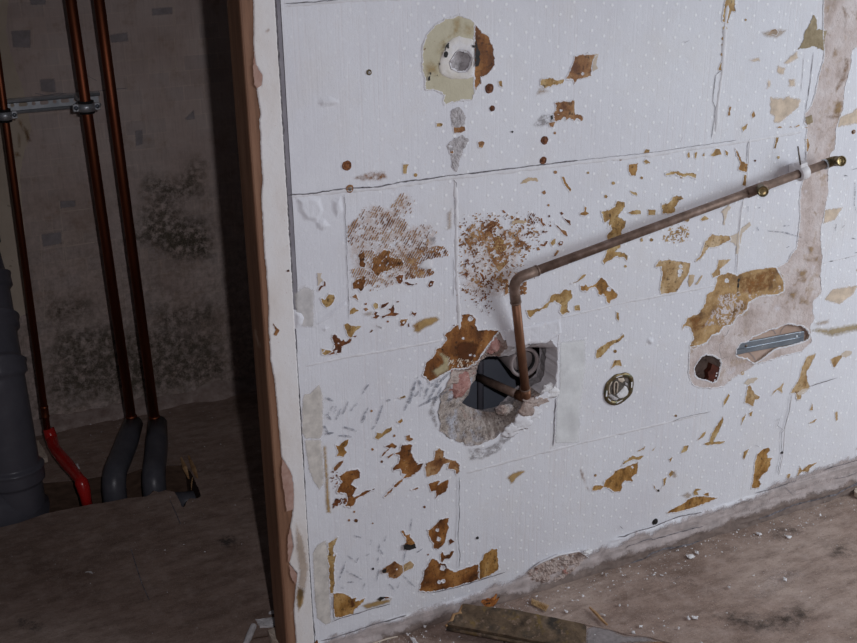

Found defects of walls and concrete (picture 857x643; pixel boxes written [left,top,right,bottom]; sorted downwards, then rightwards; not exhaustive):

peeling [421,14,497,172]
peeling [539,52,599,92]
mould [144,205,205,253]
rust [347,193,448,293]
rust [449,211,551,313]
peeling [522,177,710,268]
flaking render [653,0,857,492]
mould [55,310,217,395]
spalling [421,312,560,459]
peeling [525,273,625,370]
peeling [324,417,461,522]
peeling [372,517,500,593]